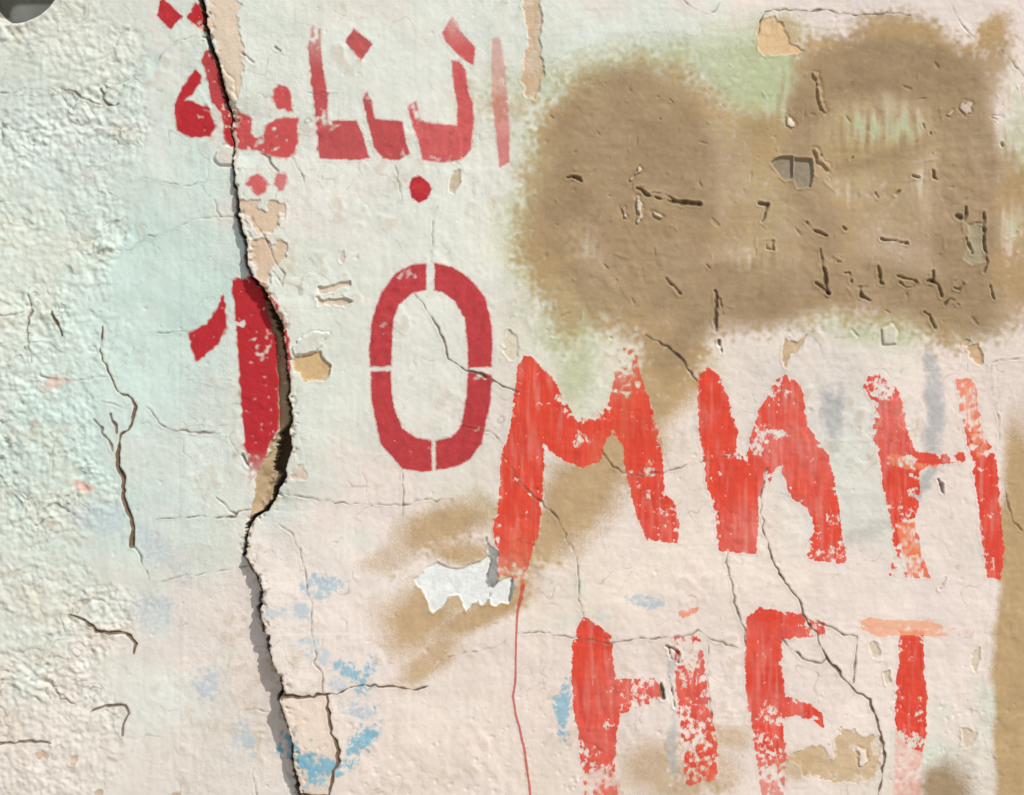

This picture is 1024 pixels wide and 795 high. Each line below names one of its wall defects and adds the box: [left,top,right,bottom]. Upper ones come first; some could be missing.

peeling [518,0,547,101]
peeling [755,14,806,58]
peeling [812,71,827,113]
peeling [769,147,831,189]
peeling [317,280,353,308]
crack [0,293,65,380]
peeling [317,350,333,383]
crack [63,0,747,795]
peeling [413,535,517,615]
crack [759,467,887,795]
crack [50,680,132,738]
peeling [787,726,882,786]